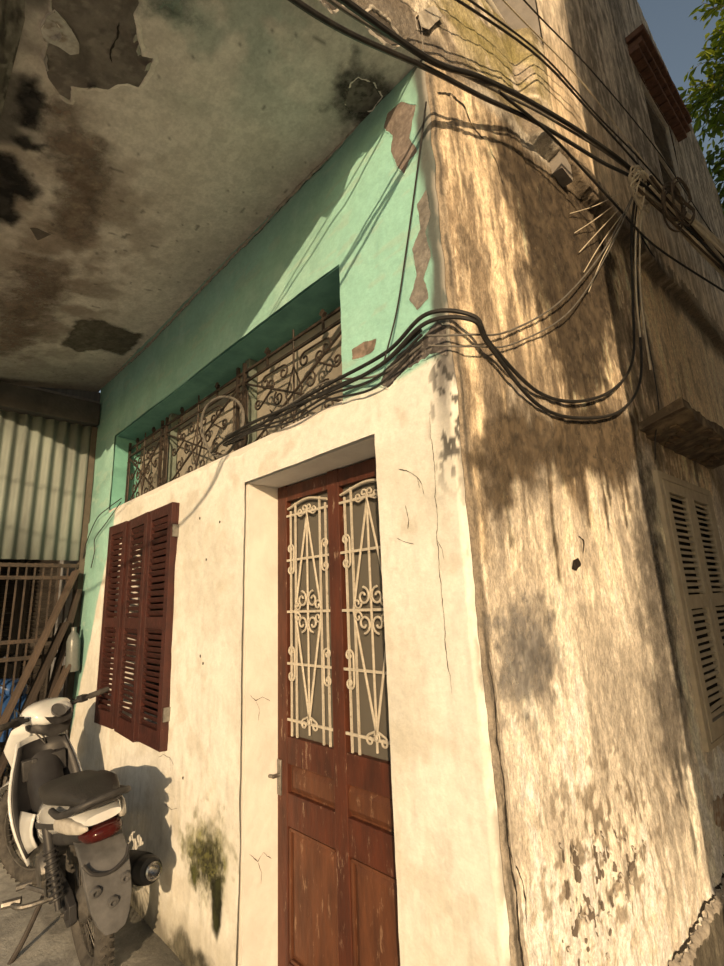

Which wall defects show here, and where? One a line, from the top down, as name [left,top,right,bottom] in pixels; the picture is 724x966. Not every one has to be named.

peeling [39,0,159,105]
leakage [0,79,107,243]
peeling [383,99,419,176]
peeling [408,188,432,313]
leakage [0,258,63,355]
peeling [351,338,378,361]
leakage [468,114,688,809]
peeling [713,794,724,831]
crack [668,855,724,966]